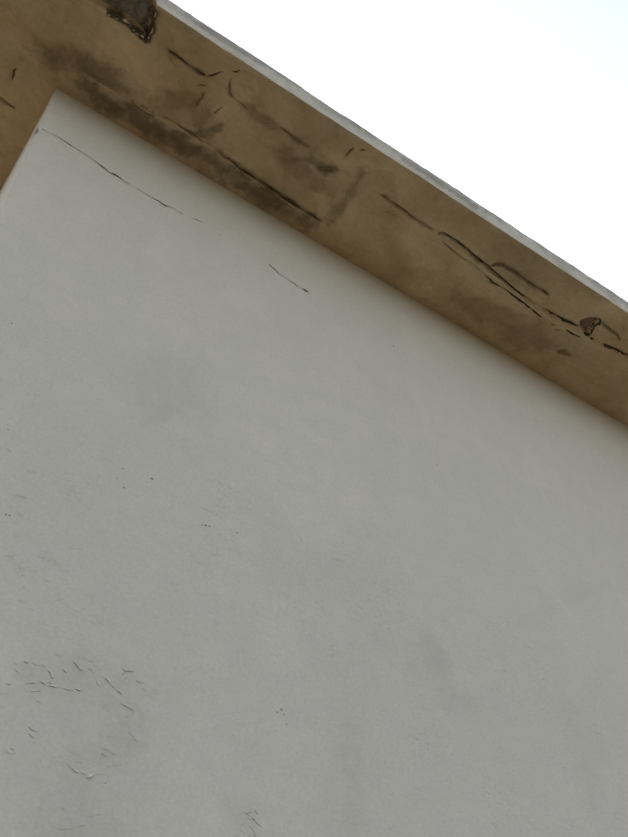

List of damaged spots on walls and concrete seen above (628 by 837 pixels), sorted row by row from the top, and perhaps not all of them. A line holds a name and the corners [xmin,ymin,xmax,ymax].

spalling [102,0,157,43]
crack [34,128,201,222]
crack [269,265,308,292]
crack [381,194,628,355]
spalling [580,317,620,346]